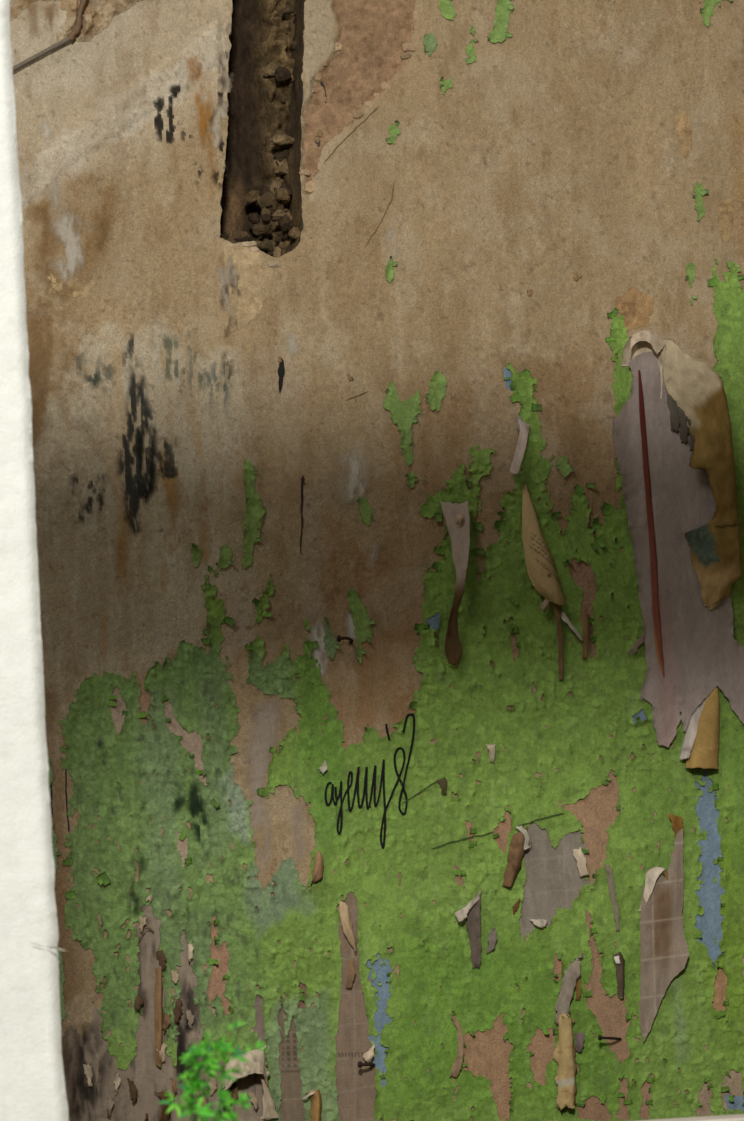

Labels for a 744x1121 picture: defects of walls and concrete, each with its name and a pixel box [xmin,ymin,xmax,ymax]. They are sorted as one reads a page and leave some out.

flaking render [10,0,142,42]
flaking render [299,0,438,195]
peeling [692,181,709,221]
flaking render [223,241,279,327]
peeling [385,255,398,283]
peeling [604,286,654,416]
peeling [685,258,744,646]
peeling [48,363,744,1121]